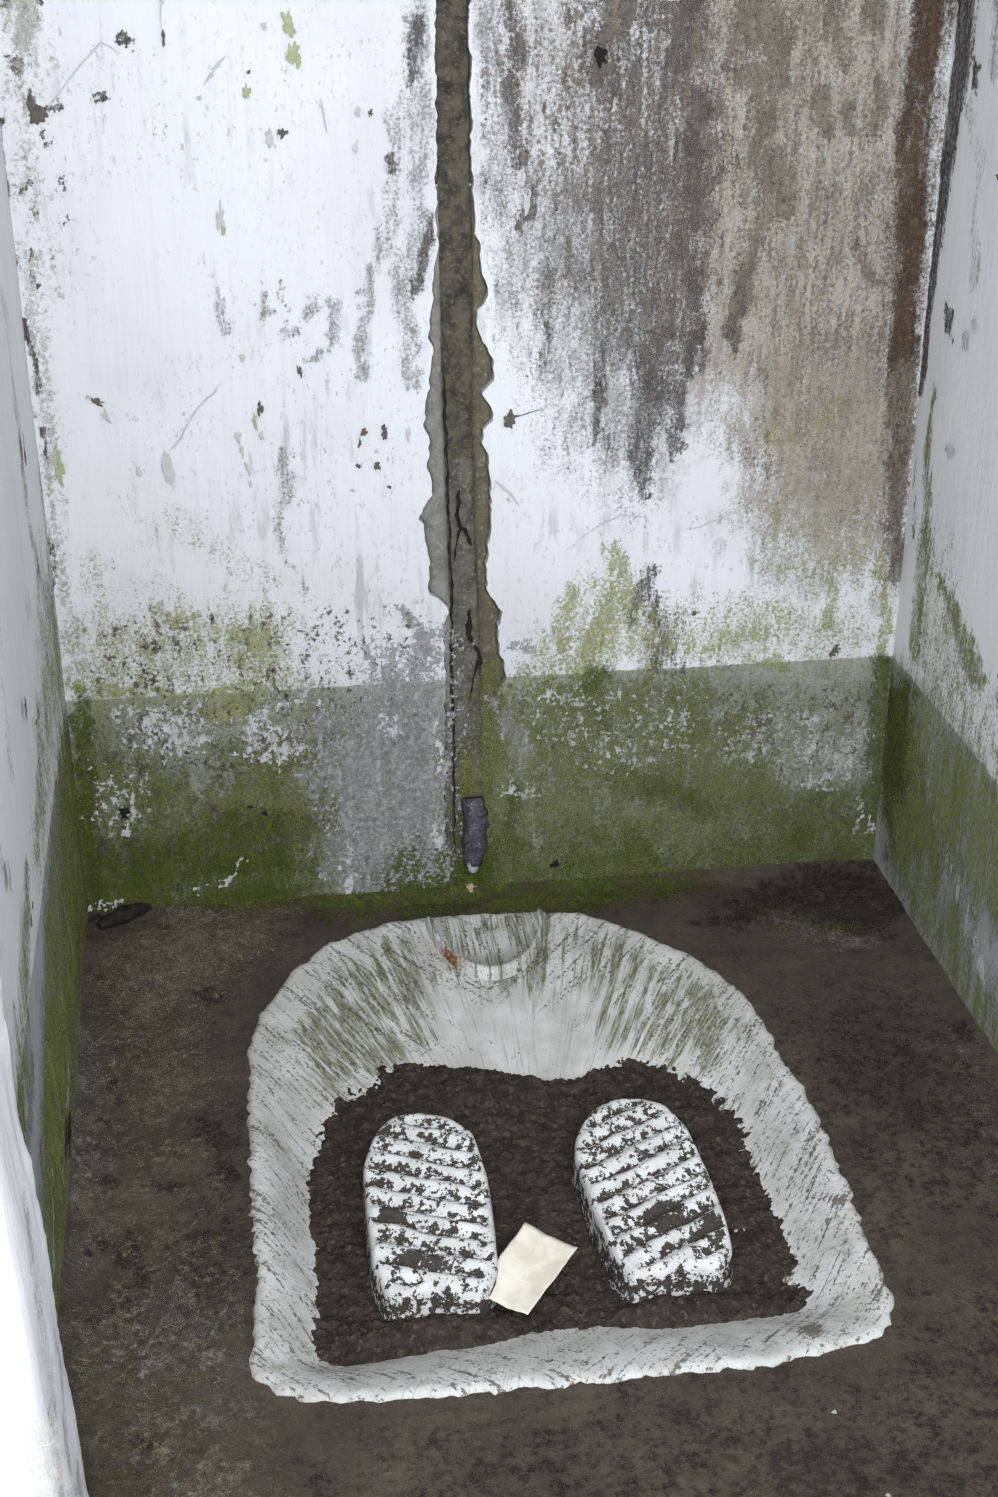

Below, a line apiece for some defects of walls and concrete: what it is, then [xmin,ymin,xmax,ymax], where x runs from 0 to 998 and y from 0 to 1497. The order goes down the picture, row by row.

peeling [0,0,64,223]
spalling [17,0,884,896]
crack [504,409,541,429]
leakage [475,0,943,674]
corrosion [879,0,956,585]
crack [442,365,519,854]
leakage [13,704,43,1145]
peeling [88,899,124,912]
leakage [688,860,906,942]
leakage [78,1116,251,1363]
leakage [775,987,998,1243]
leakage [413,1281,998,1497]